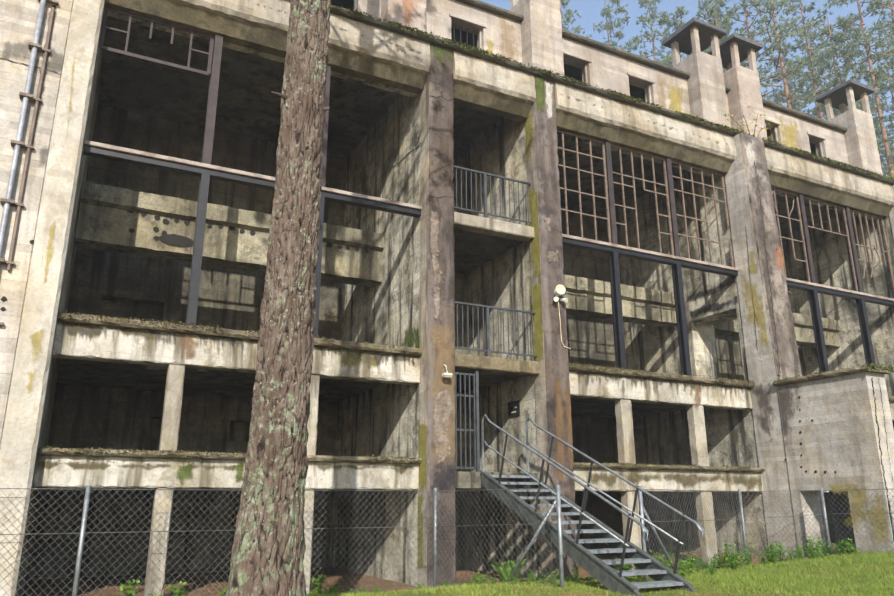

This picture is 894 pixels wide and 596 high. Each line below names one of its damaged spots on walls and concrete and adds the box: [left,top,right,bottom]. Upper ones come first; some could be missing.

damp [752,162,778,352]
damp [687,277,738,318]
spalling [433,390,453,463]
damp [578,372,693,394]
damp [720,384,798,434]
crack [871,377,894,539]